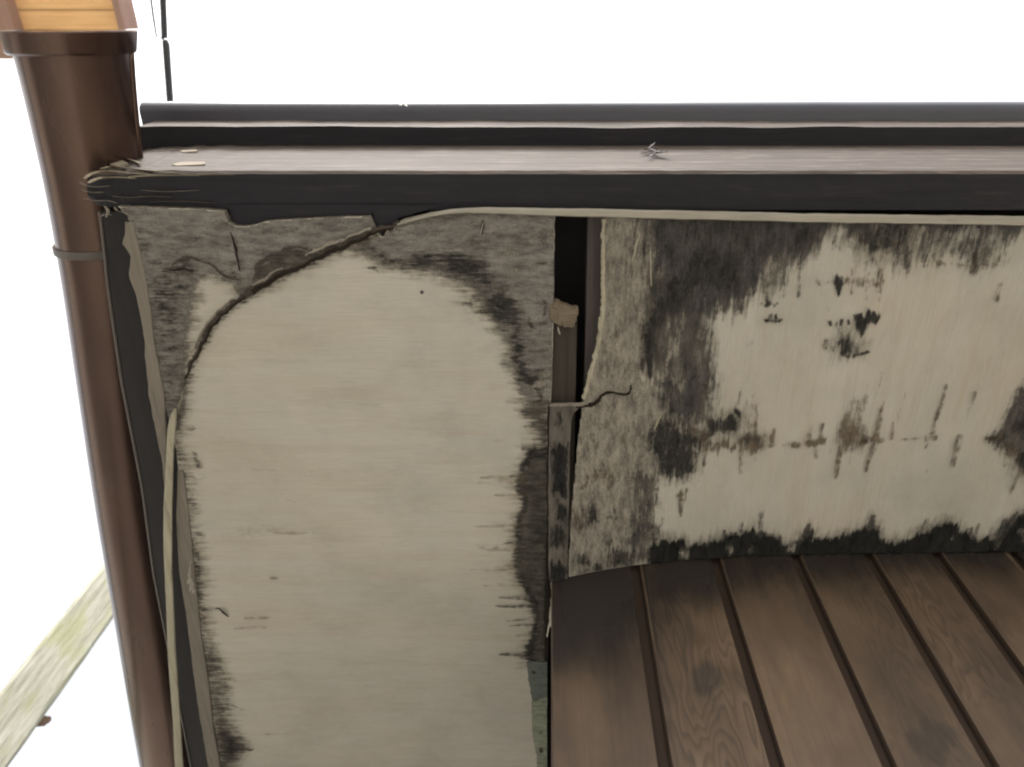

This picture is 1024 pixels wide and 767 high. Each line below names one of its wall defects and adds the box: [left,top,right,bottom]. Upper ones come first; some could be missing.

crack [165,220,400,423]
leakage [121,208,1024,668]
leakage [206,646,253,767]